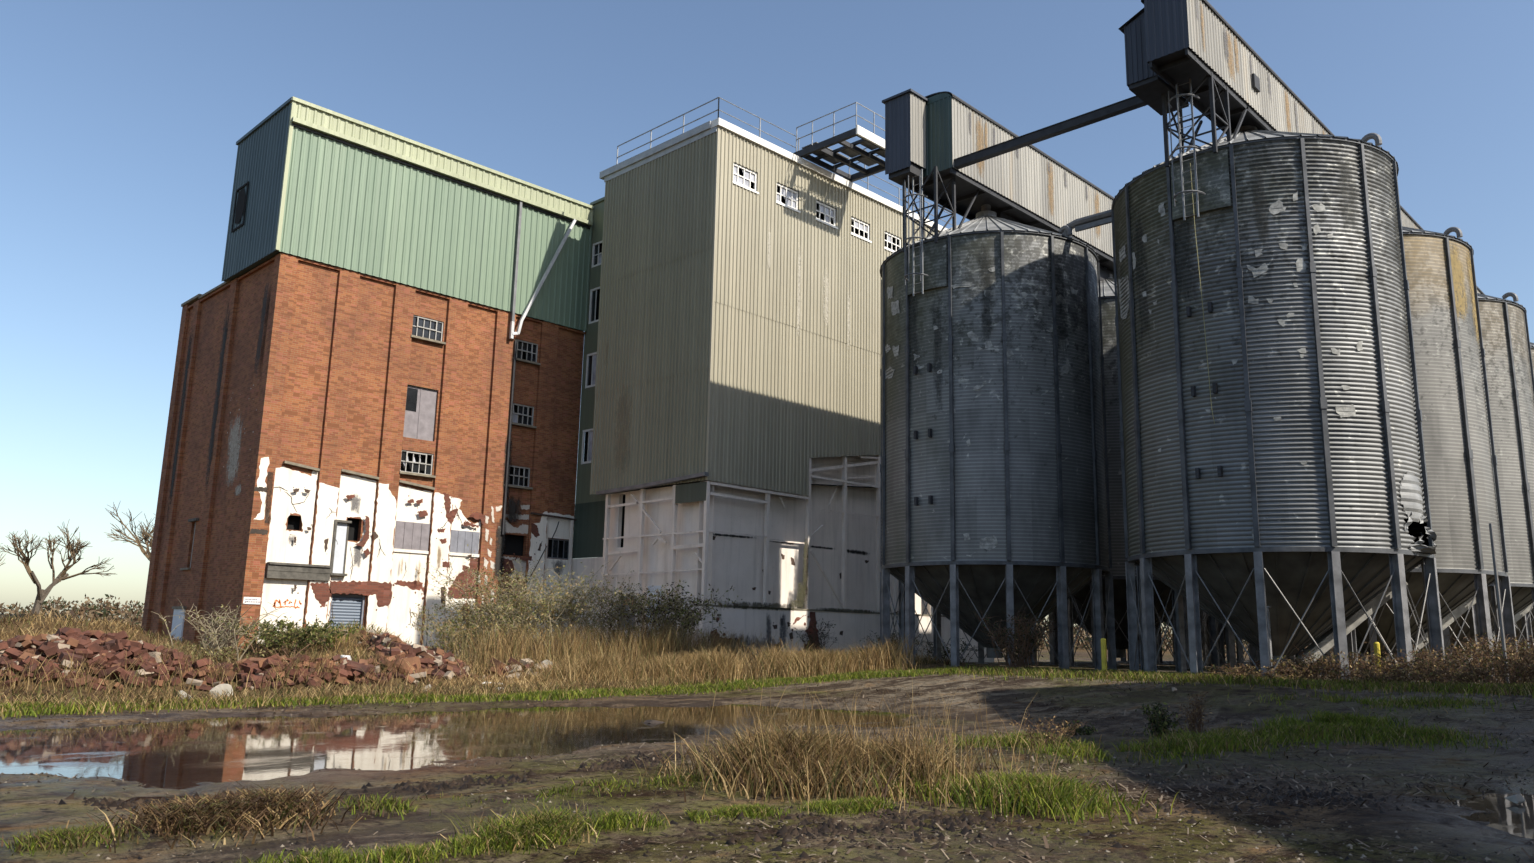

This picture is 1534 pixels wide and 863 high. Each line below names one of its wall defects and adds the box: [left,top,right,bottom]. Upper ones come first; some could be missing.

water stain [981,250,991,338]
spalling [250,472,274,535]
peeling [294,488,542,629]